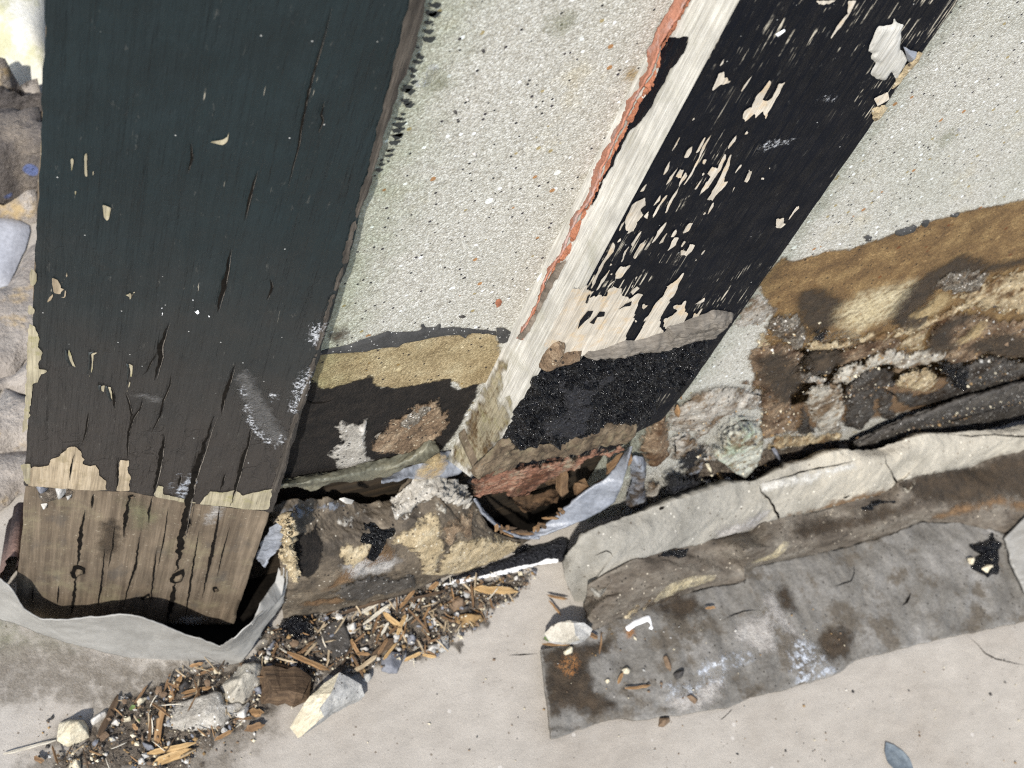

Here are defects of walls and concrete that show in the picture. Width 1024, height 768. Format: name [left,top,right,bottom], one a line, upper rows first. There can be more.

peeling [544,81,785,356]
crack [217,252,232,311]
leakage [748,200,1024,404]
spalling [742,268,1024,439]
crack [898,404,1024,437]
peeling [21,447,131,491]
crack [32,325,253,623]
peeling [154,486,272,510]
crack [759,439,852,519]
leakage [542,641,614,715]
leakage [734,588,804,655]
leakage [820,627,854,660]